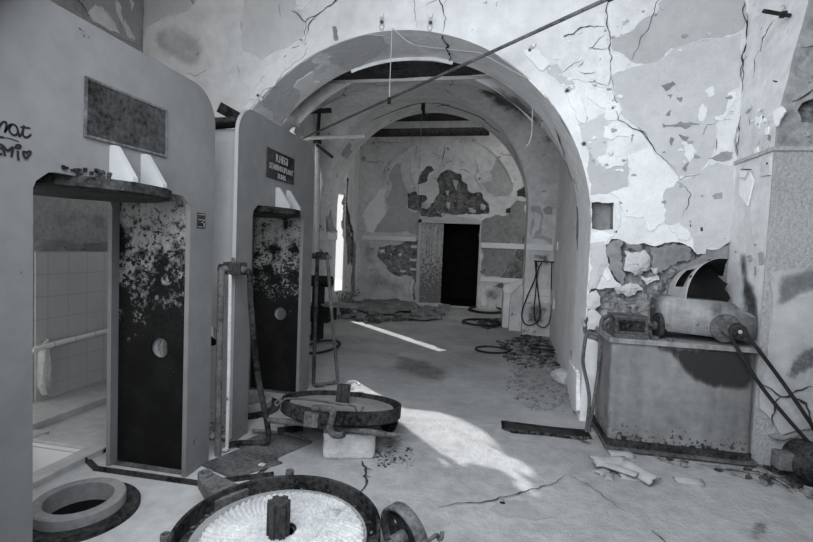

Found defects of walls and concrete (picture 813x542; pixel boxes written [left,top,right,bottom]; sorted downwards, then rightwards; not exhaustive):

flaking render [80,0,197,45]
crack [279,0,337,58]
crack [414,0,455,95]
crack [564,2,669,164]
flaking render [750,106,786,142]
spalling [798,99,813,124]
flaking render [523,0,747,342]
flaking render [327,177,354,265]
flaking render [362,158,552,308]
damp [781,272,813,300]
damp [790,348,813,376]
crack [440,475,625,511]